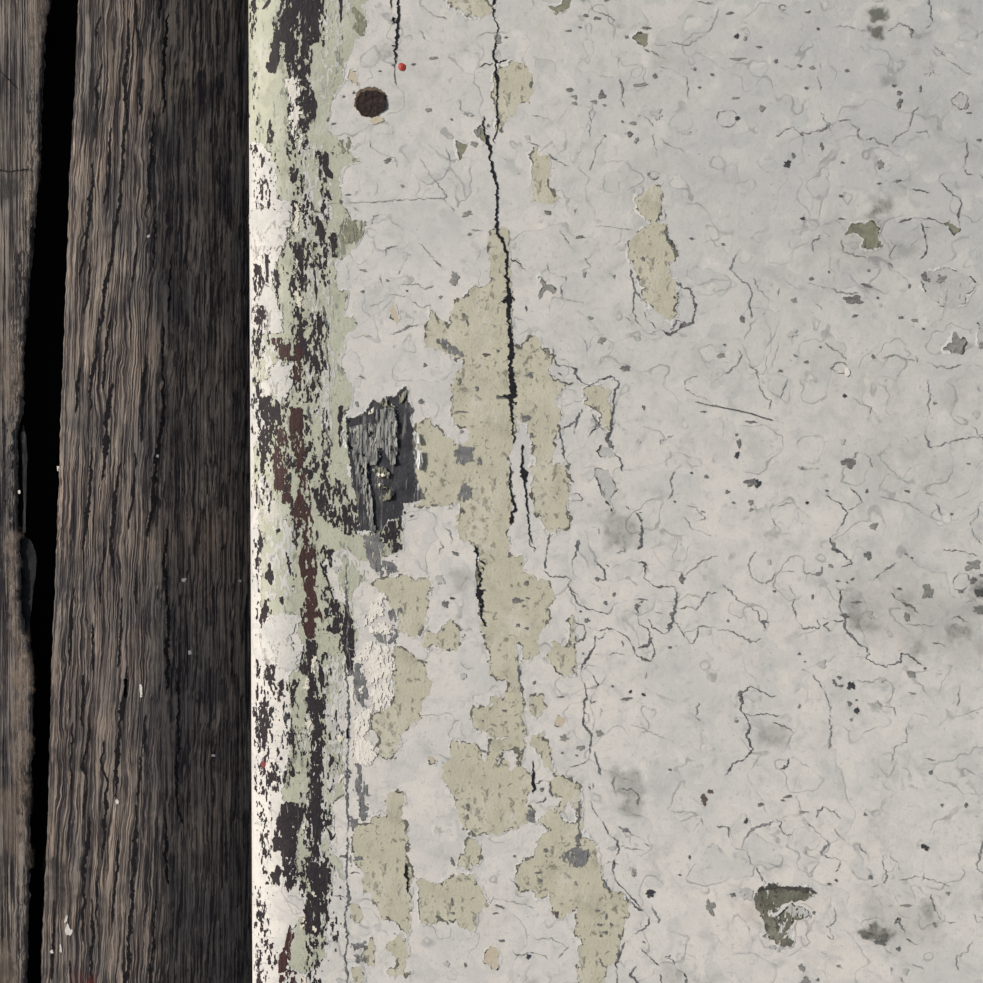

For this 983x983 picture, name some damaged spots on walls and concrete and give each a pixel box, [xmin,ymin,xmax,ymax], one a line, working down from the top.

crack [390,0,445,83]
crack [312,140,455,225]
crack [366,244,440,338]
peeling [625,171,681,326]
crack [322,306,330,383]
peeling [248,0,631,983]
crack [459,0,983,983]
crack [417,526,487,627]
crack [320,563,360,983]
crack [402,863,410,893]
spalling [730,880,816,952]